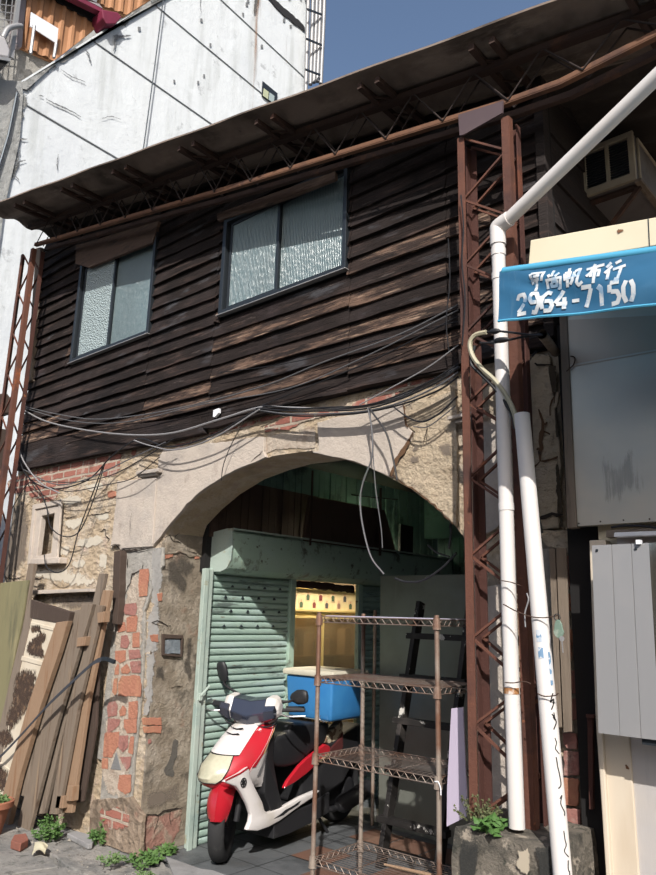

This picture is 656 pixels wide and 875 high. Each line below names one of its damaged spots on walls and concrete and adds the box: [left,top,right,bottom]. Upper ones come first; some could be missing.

crack [535,397,558,467]
flaking render [8,449,137,505]
crack [389,405,454,525]
peeling [63,517,83,530]
crack [540,512,563,538]
peeling [36,535,107,586]
water stain [169,556,193,592]
flaking render [100,548,173,830]